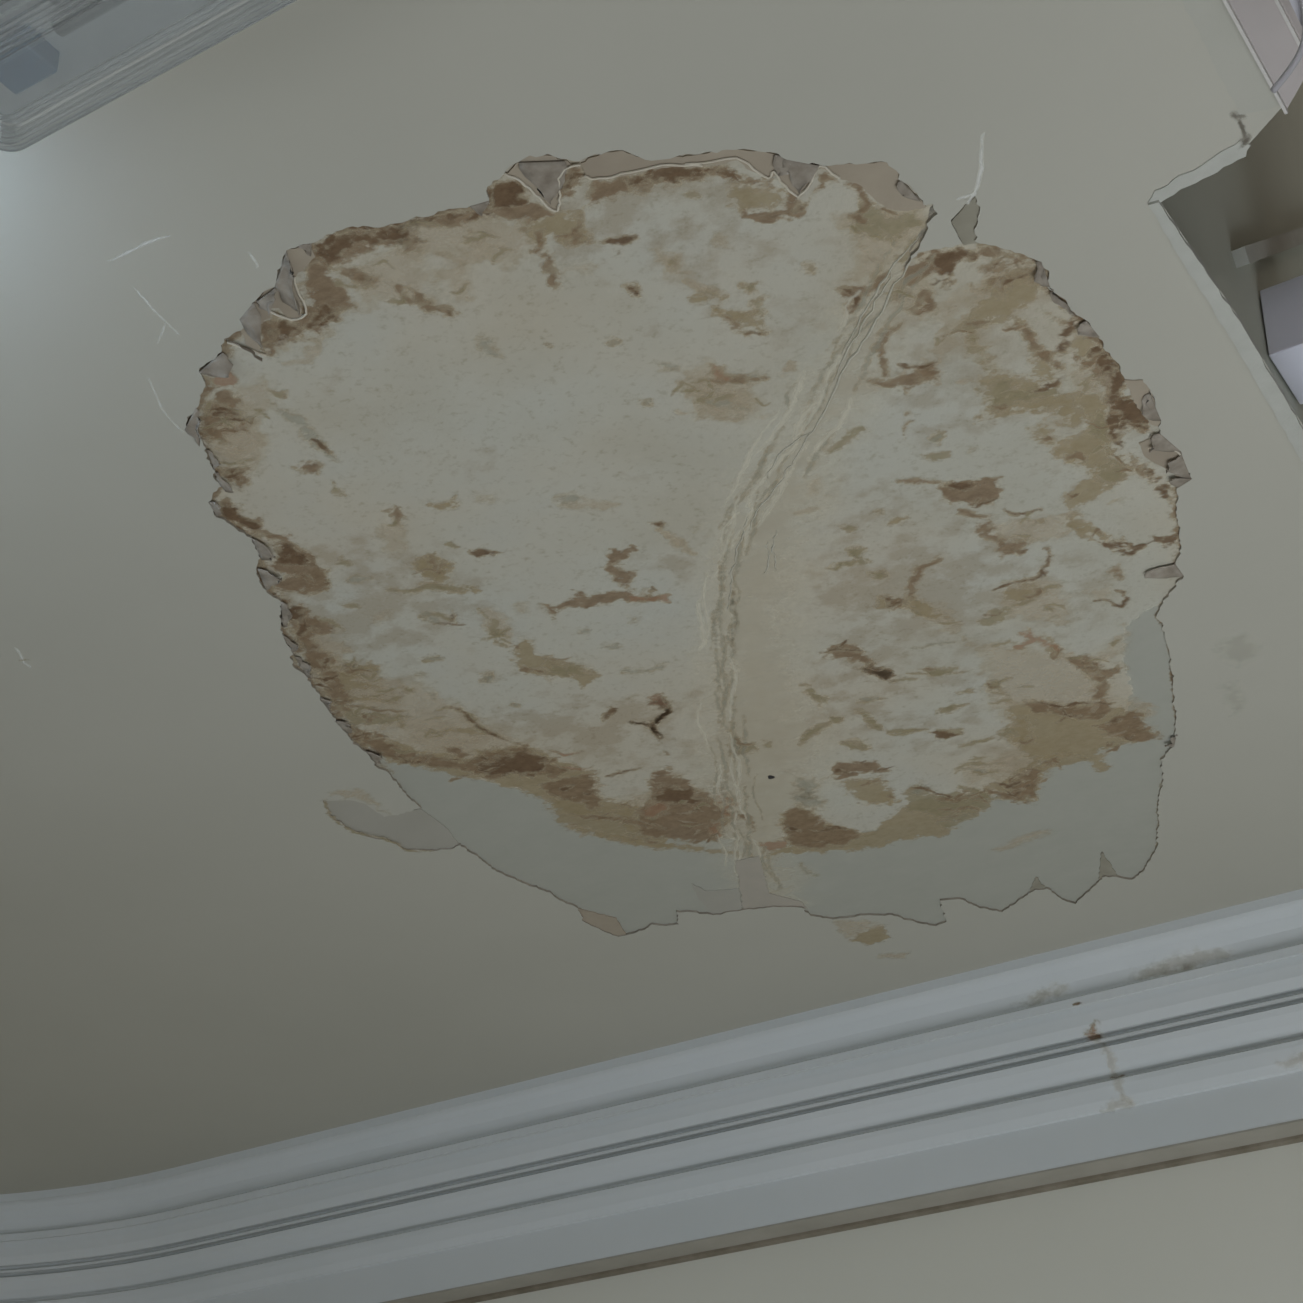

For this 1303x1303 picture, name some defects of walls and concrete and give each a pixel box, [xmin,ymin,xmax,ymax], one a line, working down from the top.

leakage [261,165,807,357]
leakage [186,331,1162,855]
peeling [185,149,1192,936]
crack [710,234,920,892]
leakage [815,168,1181,608]
spalling [1232,113,1250,147]